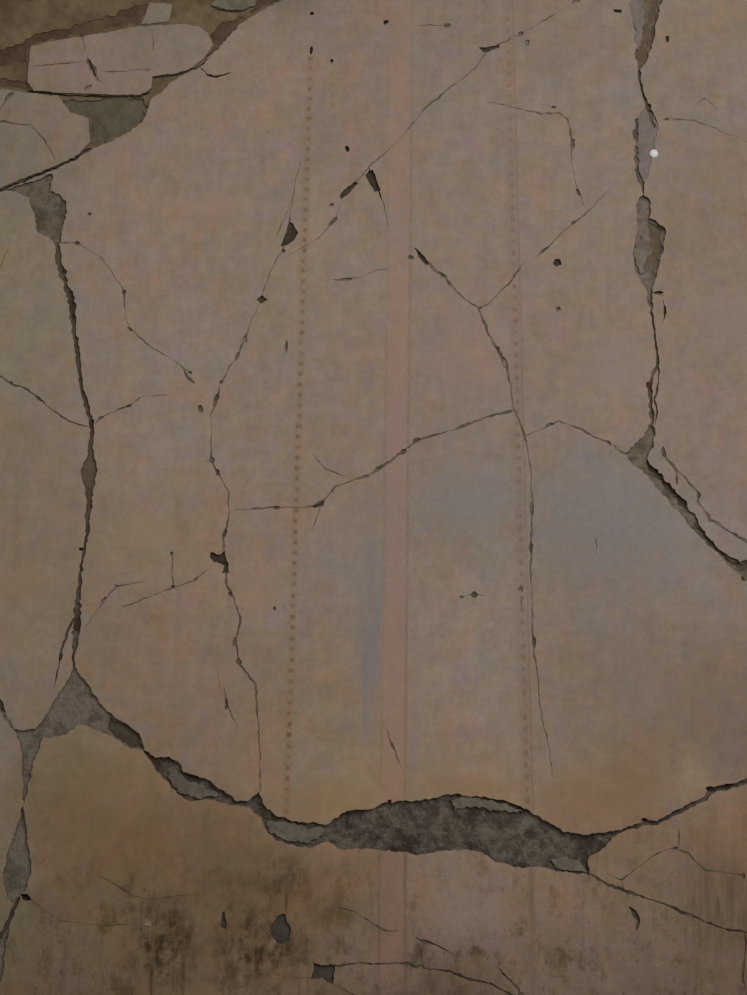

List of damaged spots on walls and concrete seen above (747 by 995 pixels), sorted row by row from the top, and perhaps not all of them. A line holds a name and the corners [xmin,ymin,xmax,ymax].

flaking render [0,2,213,247]
flaking render [613,0,669,70]
flaking render [633,108,666,311]
crack [638,69,746,142]
crack [0,0,624,791]
flaking render [624,423,747,581]
crack [646,291,747,543]
leakage [133,900,195,995]
leakage [216,909,299,978]
flaking render [0,668,659,984]
crack [333,907,524,995]
crack [589,778,747,989]